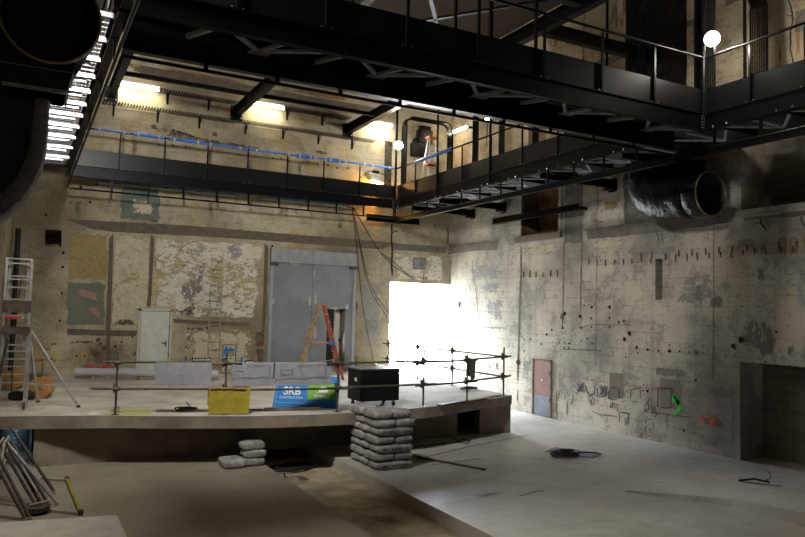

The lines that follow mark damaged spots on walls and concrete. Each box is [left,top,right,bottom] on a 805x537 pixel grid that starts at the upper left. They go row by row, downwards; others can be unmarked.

crack [786,0,796,63]
peeling [67,235,263,326]
peeling [181,328,265,362]
peeling [731,319,778,357]